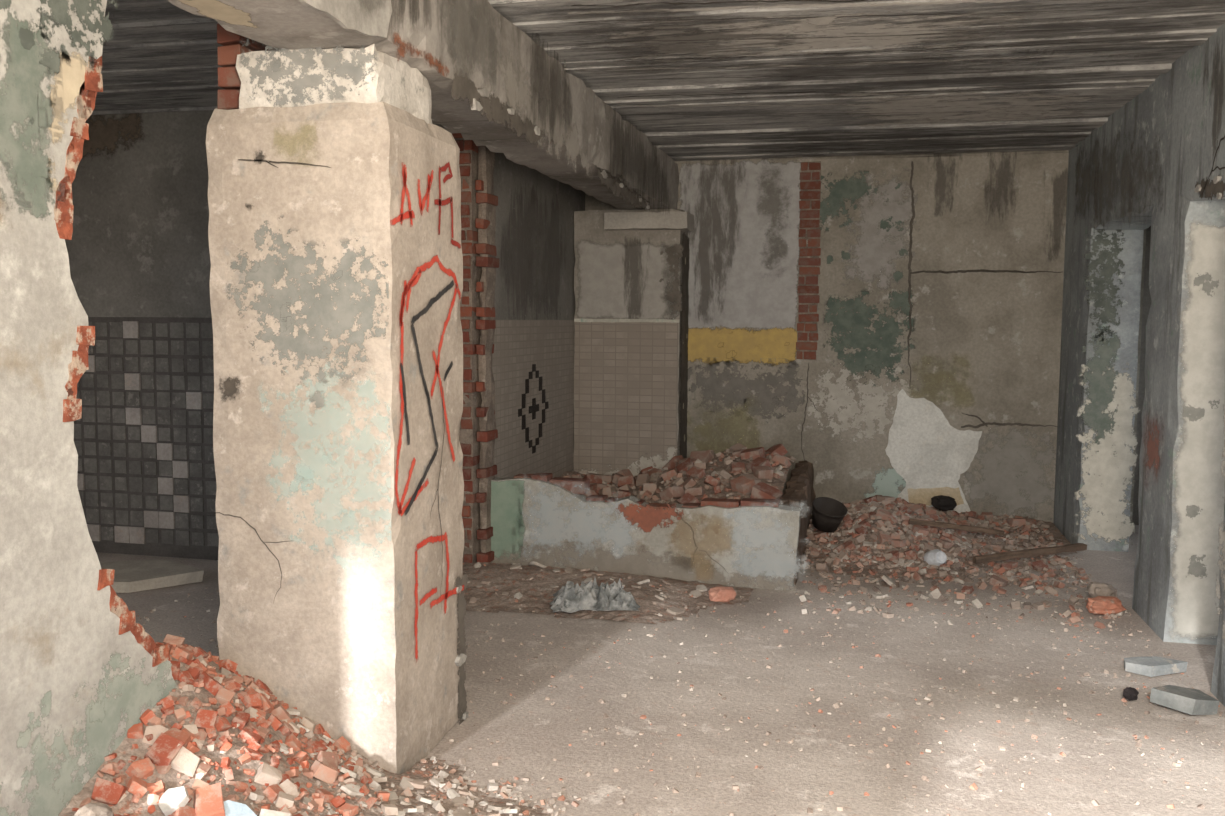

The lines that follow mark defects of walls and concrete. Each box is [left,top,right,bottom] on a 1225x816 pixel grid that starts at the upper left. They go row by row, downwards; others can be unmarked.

peeling [0,0,117,240]
spalling [178,0,257,28]
spalling [219,377,240,399]
leakage [689,160,742,320]
leakage [759,171,787,265]
peeling [659,161,982,513]
crack [571,0,1200,134]
crack [907,161,1061,383]
peeling [1075,229,1141,545]
peeling [1171,223,1225,641]
spalling [1194,175,1225,201]
spalling [616,503,685,533]